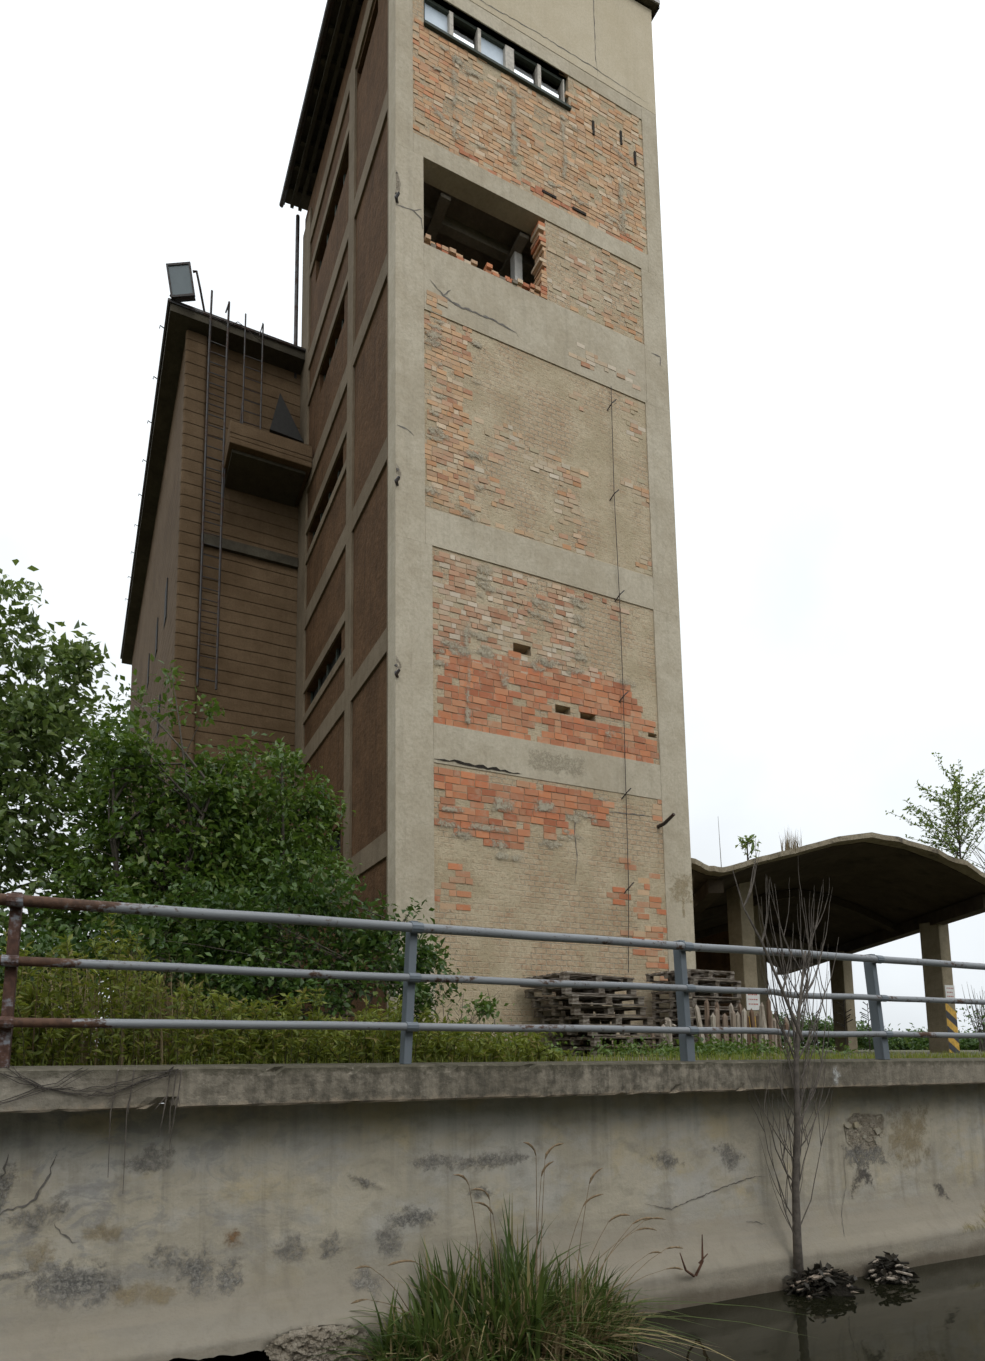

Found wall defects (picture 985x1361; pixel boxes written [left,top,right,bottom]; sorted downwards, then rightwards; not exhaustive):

flaking render [413,17,647,342]
crack [432,282,519,337]
flaking render [424,290,594,557]
flaking render [569,342,646,447]
flaking render [433,551,659,764]
flaking render [434,767,615,861]
flaking render [434,863,473,911]
flaking render [606,857,669,981]
peeling [843,1113,884,1151]
crack [0,1154,77,1243]